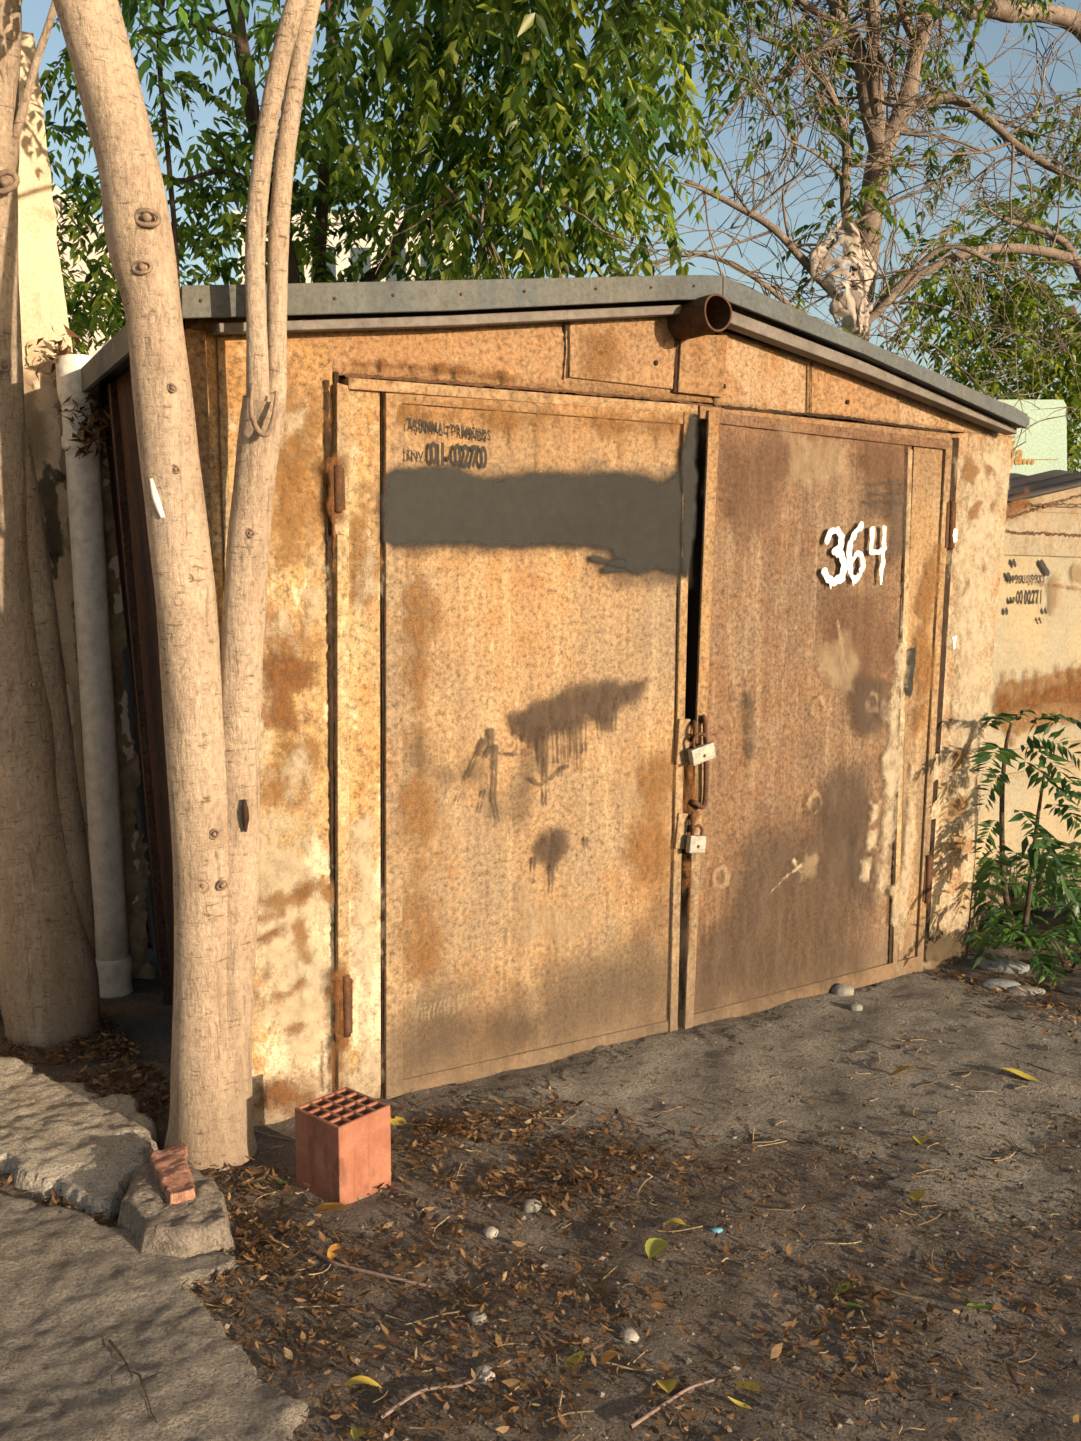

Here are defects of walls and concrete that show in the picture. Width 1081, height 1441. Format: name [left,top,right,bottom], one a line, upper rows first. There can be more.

rust [270,399,382,603]
rust [260,611,320,805]
rust [995,668,1081,746]
peeling [861,626,915,944]
rust [258,879,336,962]
rust [331,966,355,1092]
rust [258,1078,315,1110]